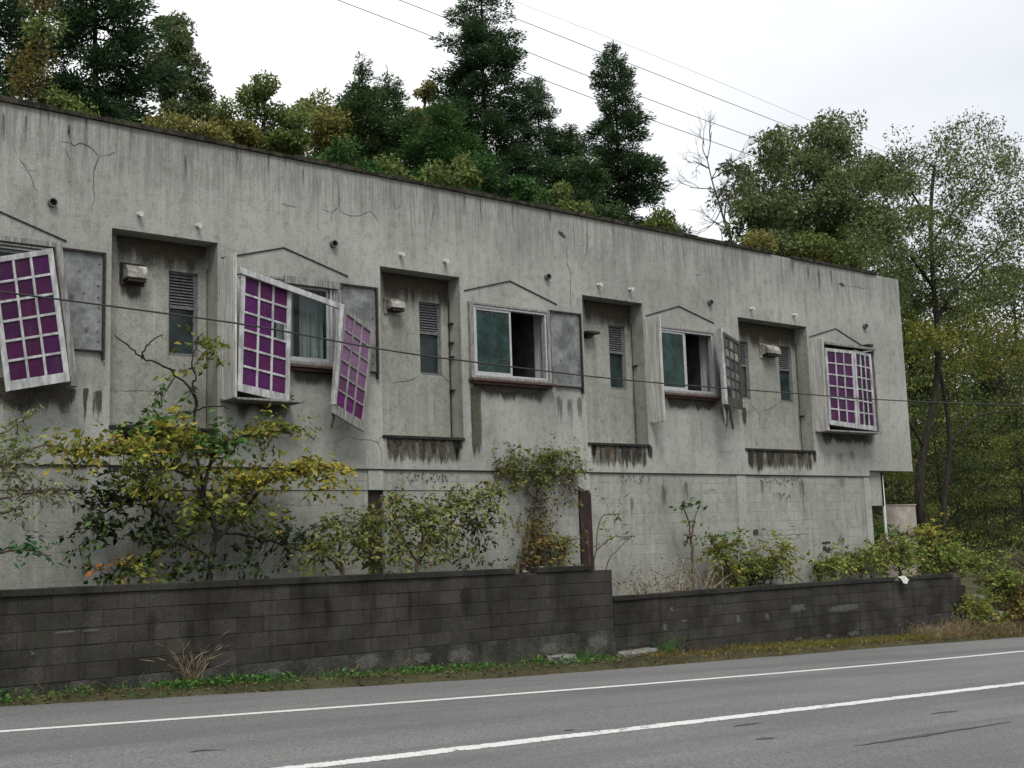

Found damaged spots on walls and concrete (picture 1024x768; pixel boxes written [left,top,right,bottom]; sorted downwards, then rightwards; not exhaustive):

crack [62,119,121,208]
leakage [0,377,102,421]
leakage [387,384,547,486]
leakage [557,396,582,418]
leakage [591,445,666,514]
leakage [748,451,816,504]